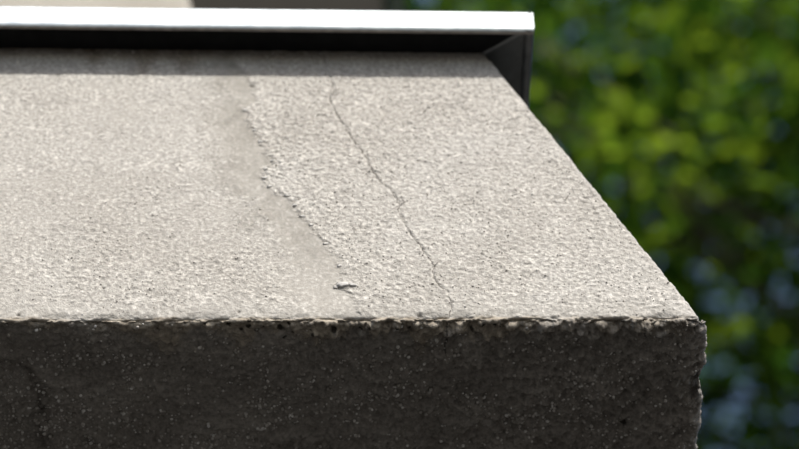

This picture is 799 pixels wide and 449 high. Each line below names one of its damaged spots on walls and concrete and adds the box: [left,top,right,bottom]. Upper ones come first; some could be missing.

crack [393,195,452,358]